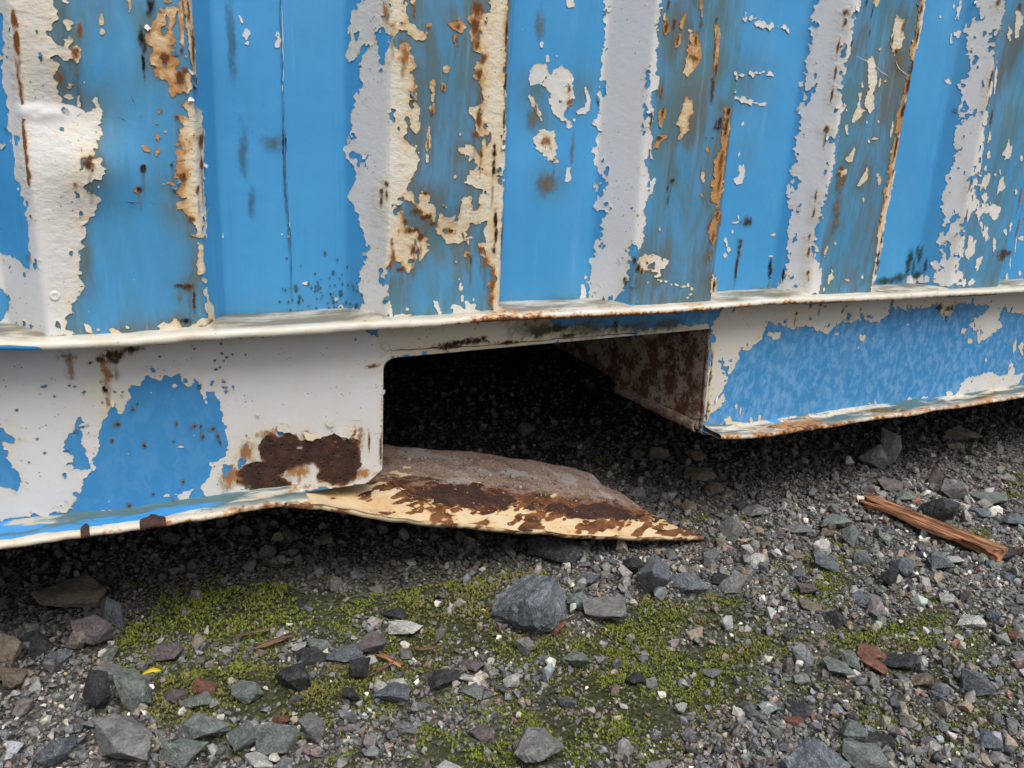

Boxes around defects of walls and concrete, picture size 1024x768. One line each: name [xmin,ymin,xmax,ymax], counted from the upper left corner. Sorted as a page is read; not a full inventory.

corrosion [138,28,146,77]
corrosion [159,1,198,89]
peeling [0,0,1024,537]
corrosion [221,422,382,490]
corrosion [396,481,663,523]